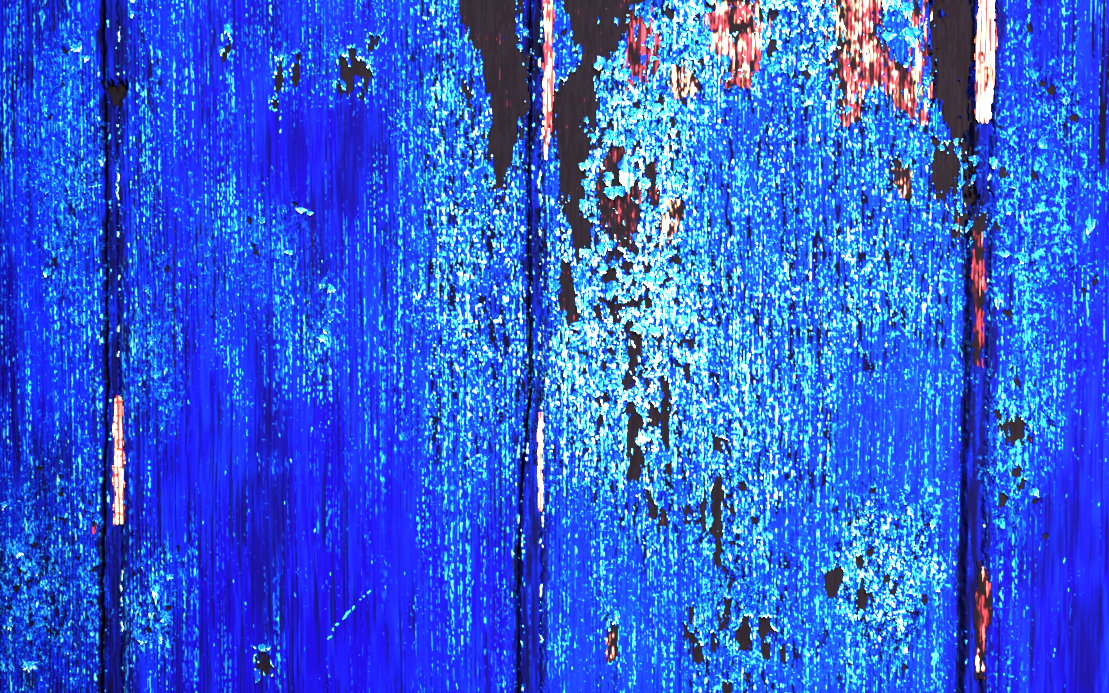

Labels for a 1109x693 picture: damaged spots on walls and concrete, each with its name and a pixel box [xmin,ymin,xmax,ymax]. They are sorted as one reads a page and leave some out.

peeling [217,24,231,63]
peeling [268,47,300,110]
peeling [333,26,385,101]
peeling [454,0,531,211]
peeling [548,0,932,528]
peeling [605,611,620,663]
peeling [680,427,789,693]
peeling [821,484,941,643]